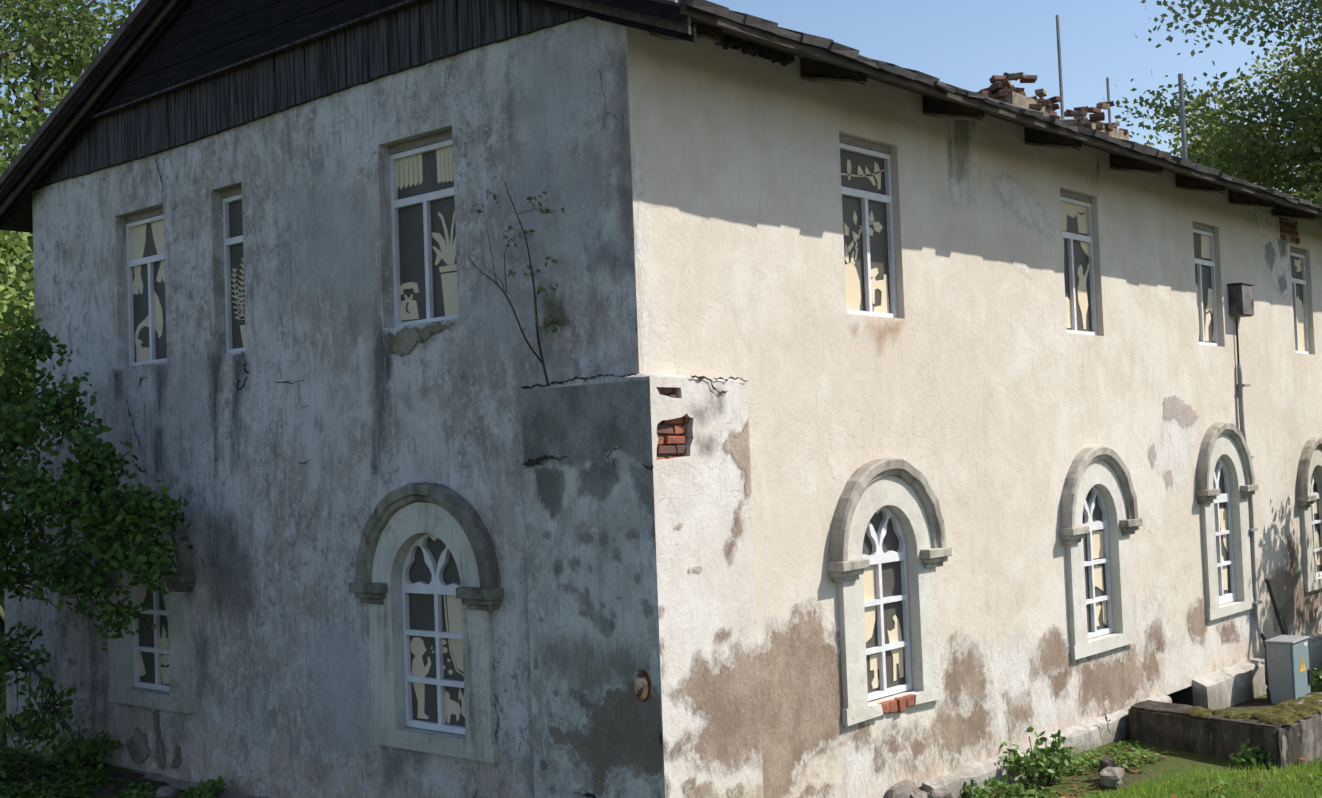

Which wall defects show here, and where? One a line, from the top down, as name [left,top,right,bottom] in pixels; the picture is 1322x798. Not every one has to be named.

spalling [382,321,456,357]
water stain [157,354,242,464]
spalling [656,387,679,398]
peeling [1163,395,1199,428]
crack [522,455,567,467]
spalling [657,417,689,460]
peeling [1149,445,1174,488]
peeling [724,417,752,565]
peeling [1269,535,1322,633]
peeling [1188,598,1239,645]
peeling [541,596,1167,798]
spalling [124,710,181,772]